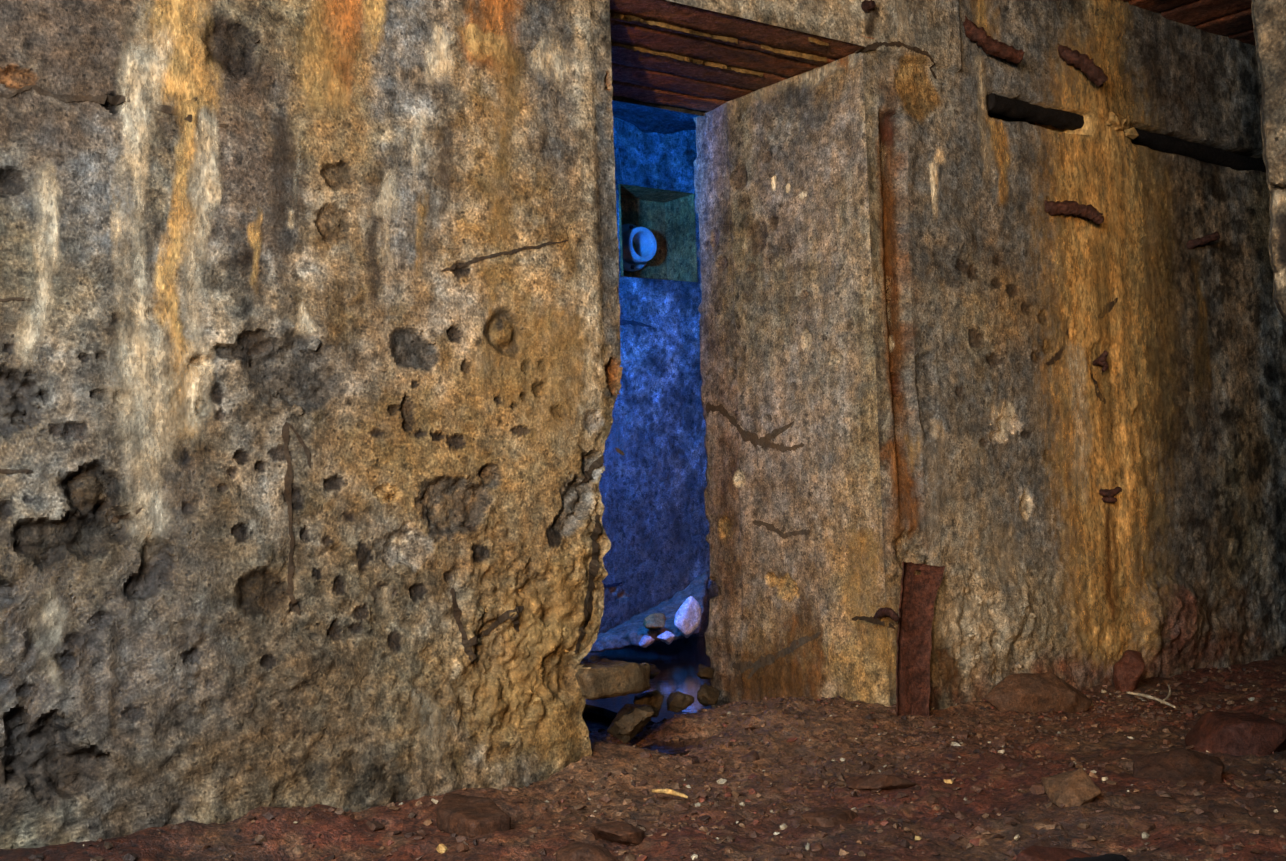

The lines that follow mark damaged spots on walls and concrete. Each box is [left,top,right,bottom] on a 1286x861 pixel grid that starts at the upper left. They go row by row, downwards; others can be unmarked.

corrosion [307,0,385,102]
crack [855,41,937,79]
corrosion [963,15,1025,64]
corrosion [879,111,894,143]
crack [441,240,568,271]
spalling [0,344,90,442]
spalling [78,350,110,362]
crack [705,402,804,453]
corrosion [1030,0,1161,661]
spalling [0,459,178,602]
spalling [468,447,605,707]
corrosion [896,562,945,717]